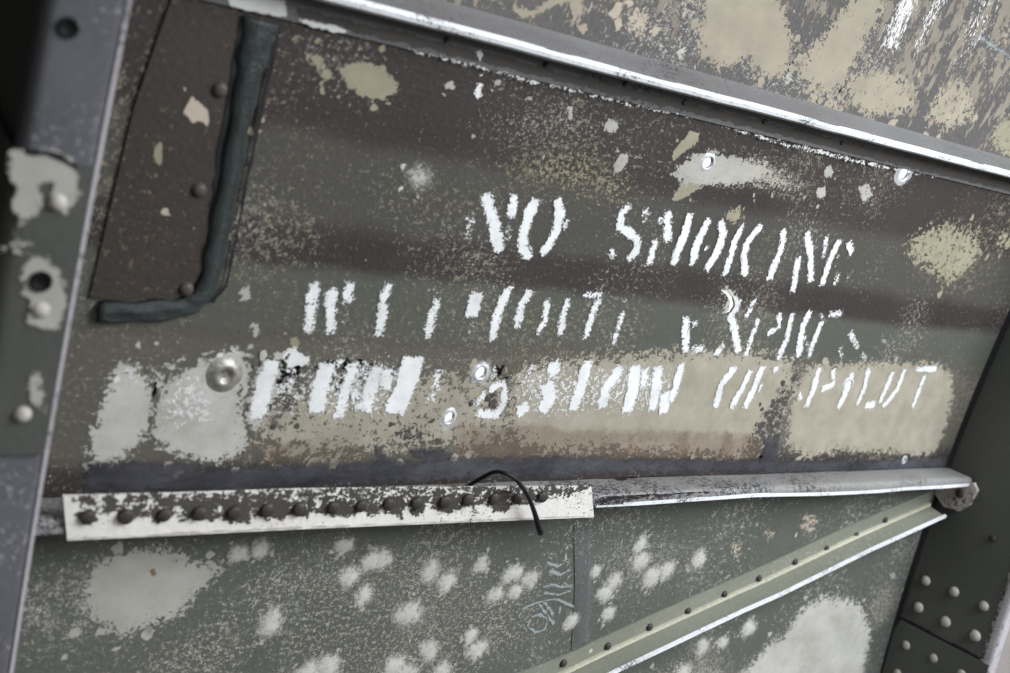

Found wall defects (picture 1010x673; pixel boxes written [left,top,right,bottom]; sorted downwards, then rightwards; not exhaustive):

peeling [228,0,399,111]
peeling [358,48,688,240]
peeling [1,147,82,331]
peeling [25,371,48,413]
peeling [82,275,955,472]
peeling [794,511,819,538]
peeling [60,529,557,673]
peeling [627,572,904,673]